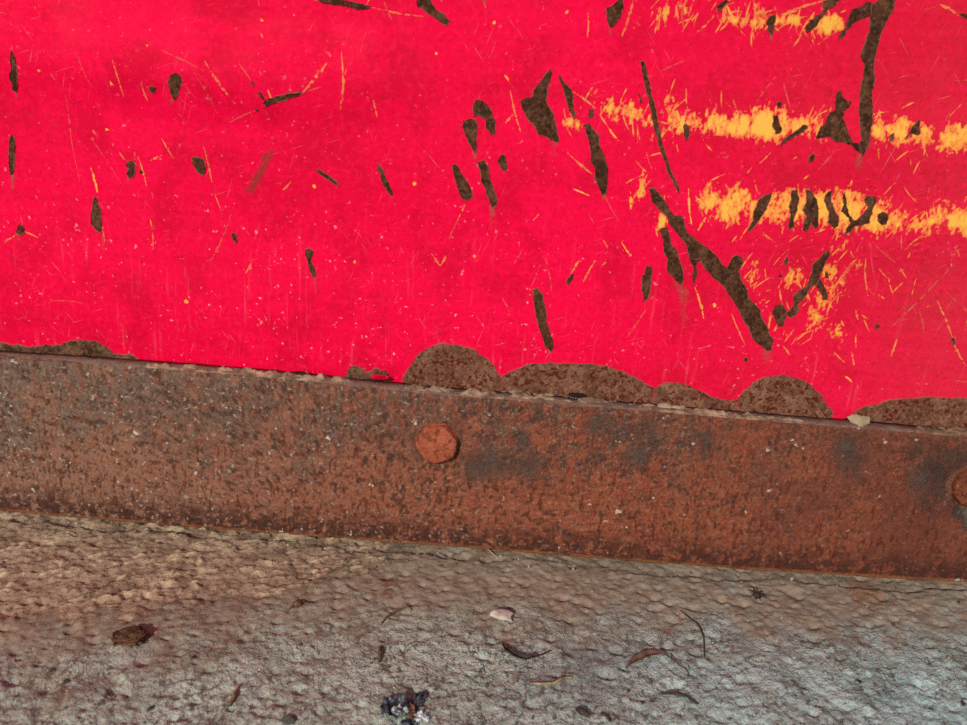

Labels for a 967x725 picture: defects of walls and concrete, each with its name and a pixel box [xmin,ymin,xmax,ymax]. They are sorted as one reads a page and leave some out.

peeling [9,50,18,95]
peeling [8,133,16,186]
peeling [452,100,508,217]
peeling [520,0,967,356]
peeling [90,196,104,246]
peeling [0,288,833,425]
peeling [846,395,967,438]
rust [0,350,967,638]
rust [0,583,136,648]